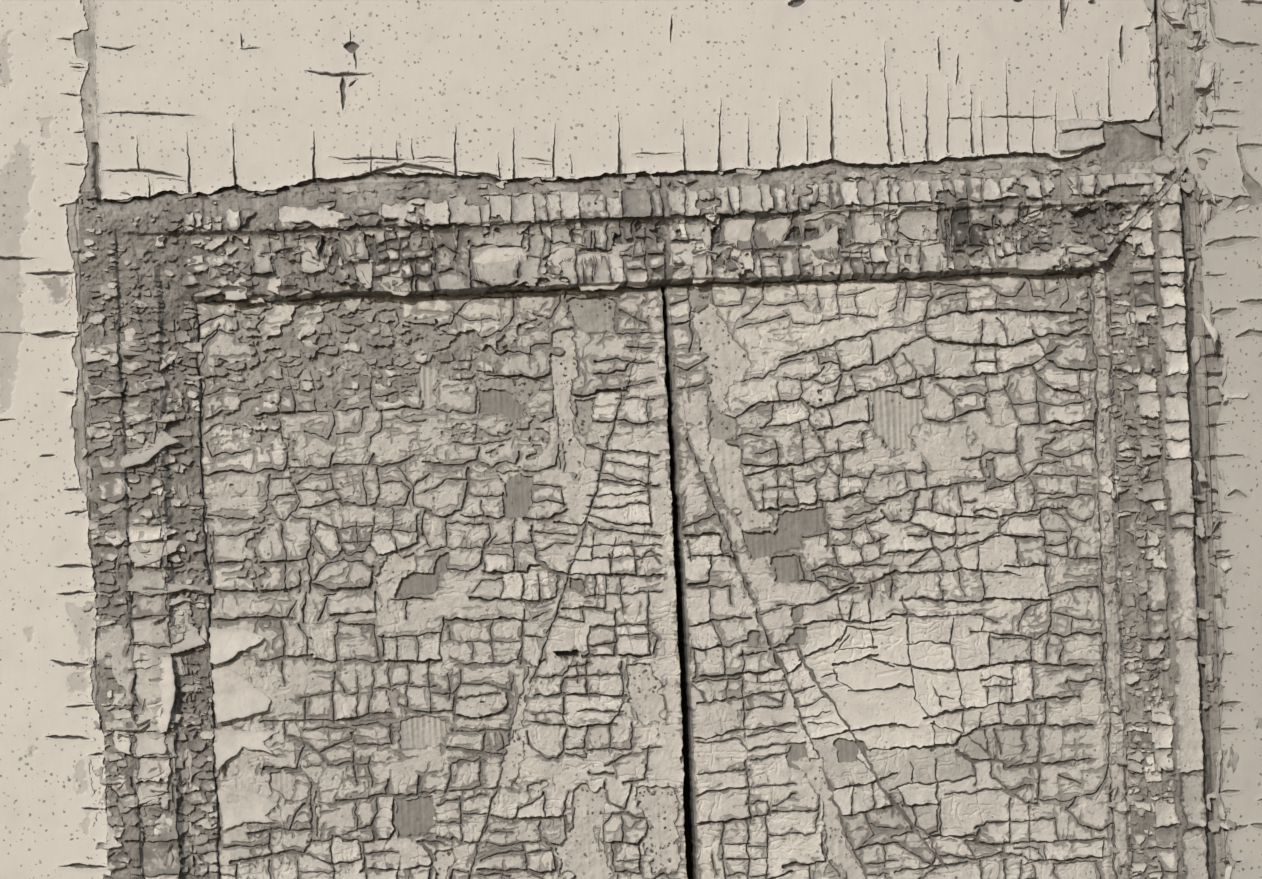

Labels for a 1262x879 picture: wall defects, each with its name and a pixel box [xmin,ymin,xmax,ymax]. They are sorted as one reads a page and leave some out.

crack [54,36,240,198]
crack [310,121,576,180]
crack [616,77,838,174]
crack [882,23,1150,165]
peeling [1057,118,1105,151]
peeling [1130,121,1162,137]
peeling [1144,0,1220,149]
crack [0,254,76,279]
crack [0,328,78,341]
peeling [71,154,1239,879]
crack [196,272,1117,879]
crack [43,702,104,759]